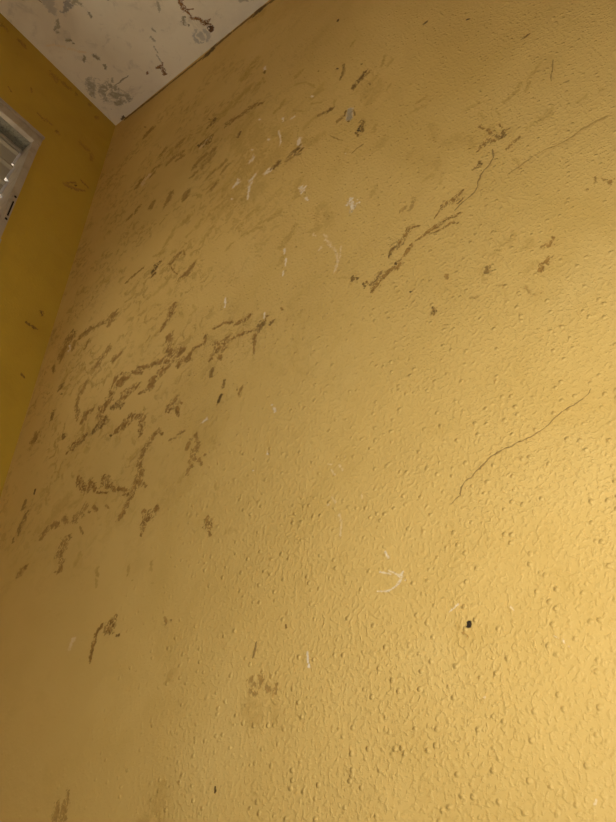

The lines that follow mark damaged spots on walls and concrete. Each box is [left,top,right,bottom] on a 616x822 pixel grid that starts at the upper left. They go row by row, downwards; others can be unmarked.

damp [81,52,134,121]
crack [508,115,609,174]
crack [454,149,495,211]
peeling [125,249,199,300]
peeling [38,300,284,576]
crack [451,389,591,504]